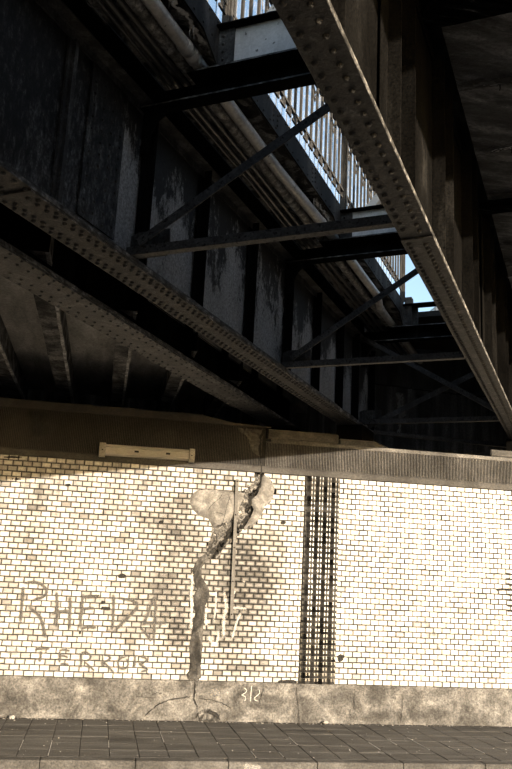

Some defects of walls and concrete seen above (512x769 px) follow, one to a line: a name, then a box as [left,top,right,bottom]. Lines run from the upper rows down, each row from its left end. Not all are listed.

crack [196,473,274,559]
crack [137,683,228,718]